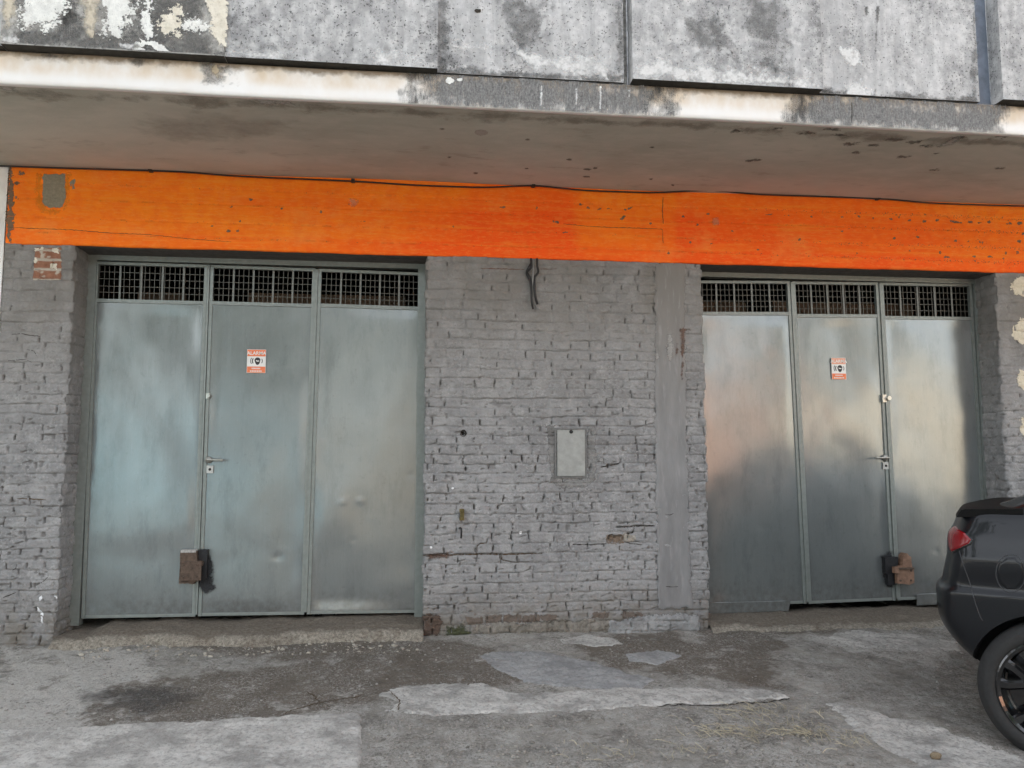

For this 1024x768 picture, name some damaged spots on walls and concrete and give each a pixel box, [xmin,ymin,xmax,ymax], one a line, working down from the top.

peeling [2,0,230,52]
leakage [407,0,1008,154]
peeling [42,173,76,208]
peeling [33,247,62,280]
peeling [1010,276,1024,297]
peeling [1012,317,1024,344]
rust [676,328,690,379]
peeling [1016,369,1024,390]
spalling [606,533,636,544]